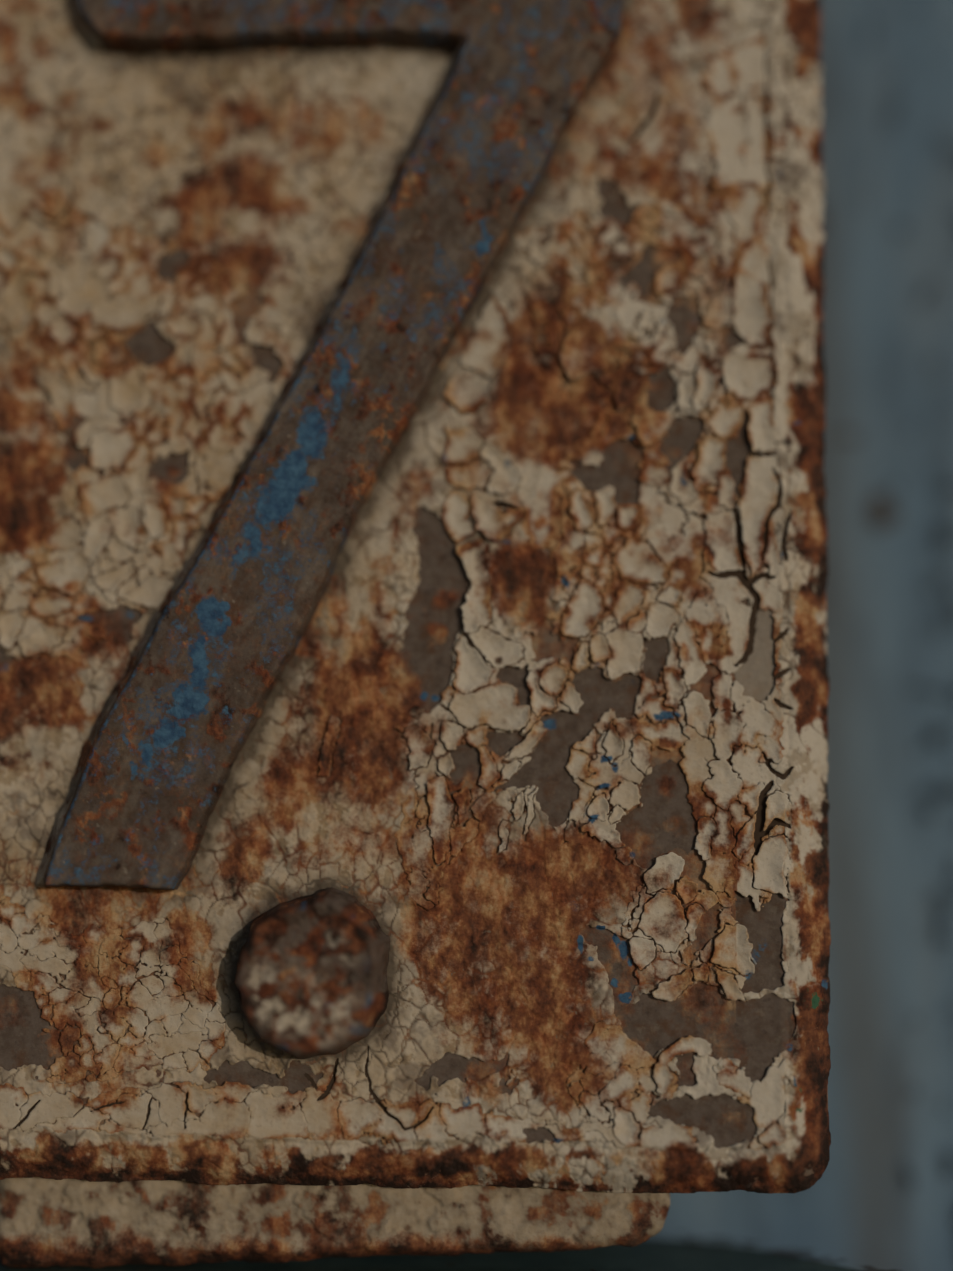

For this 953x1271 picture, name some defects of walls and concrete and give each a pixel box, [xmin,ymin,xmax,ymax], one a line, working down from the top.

rust [784,0,822,80]
rust [6,115,115,188]
rust [138,94,307,293]
rust [779,104,824,187]
peeling [0,32,796,1150]
crack [707,452,792,710]
rust [0,199,831,1194]
crack [754,752,793,855]
crack [13,1100,41,1129]
crack [90,1098,152,1130]
crack [182,1092,190,1128]
crack [304,1046,438,1131]